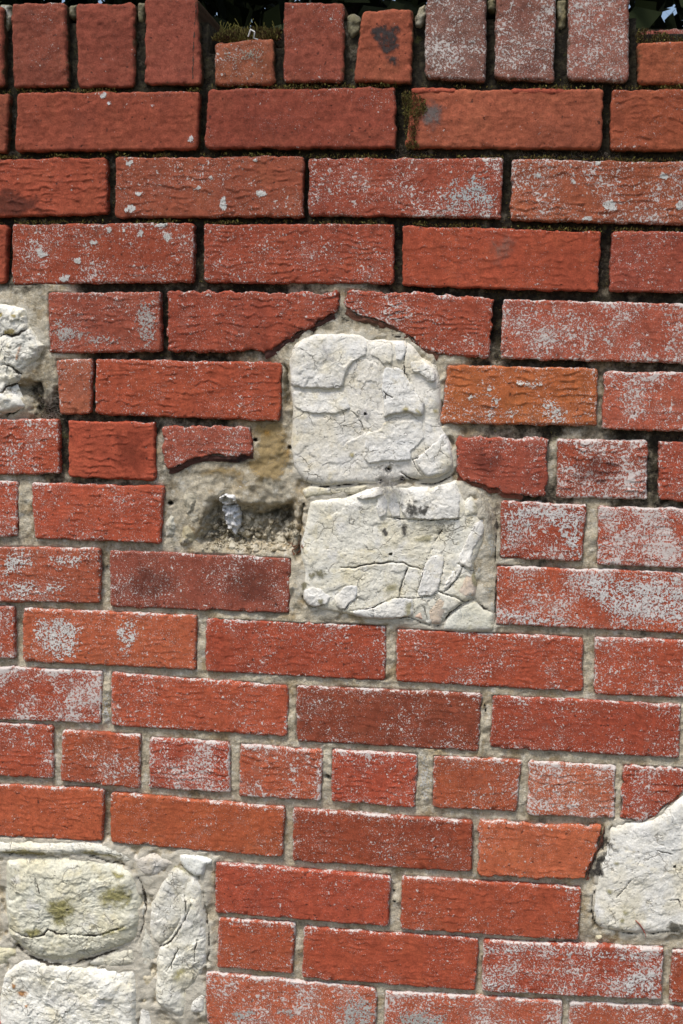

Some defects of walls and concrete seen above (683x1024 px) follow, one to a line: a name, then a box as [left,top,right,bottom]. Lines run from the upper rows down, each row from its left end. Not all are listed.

spalling [169,453,254,474]
crack [401,447,450,485]
crack [341,512,499,626]
water stain [32,615,83,660]
water stain [114,618,139,657]
water stain [497,610,567,628]
water stain [560,571,683,630]
crack [10,855,210,968]